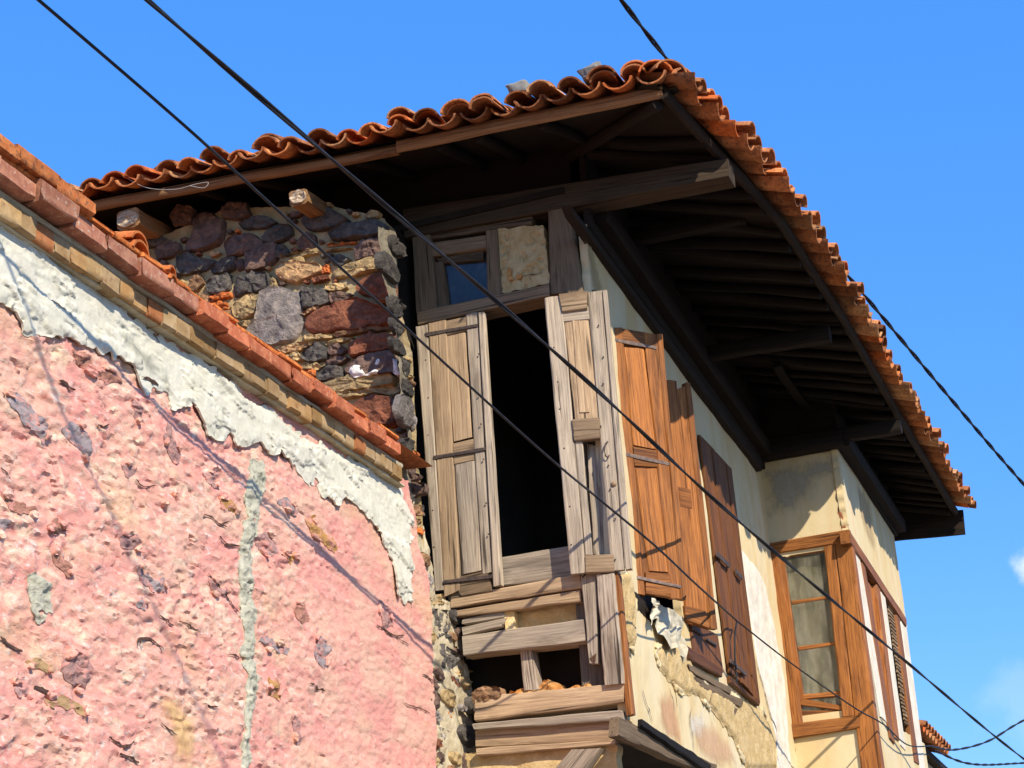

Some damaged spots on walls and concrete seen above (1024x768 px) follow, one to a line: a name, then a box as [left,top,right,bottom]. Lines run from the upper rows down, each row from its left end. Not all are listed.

peeling [72,348,123,385]
peeling [2,388,93,463]
peeling [163,421,183,464]
peeling [202,465,242,515]
peeling [0,489,76,578]
peeling [118,529,169,610]
peeling [254,528,301,565]
leakage [237,459,267,768]
peeling [293,599,333,669]
peeling [618,570,656,653]
peeling [11,649,94,716]
peeling [654,637,778,768]